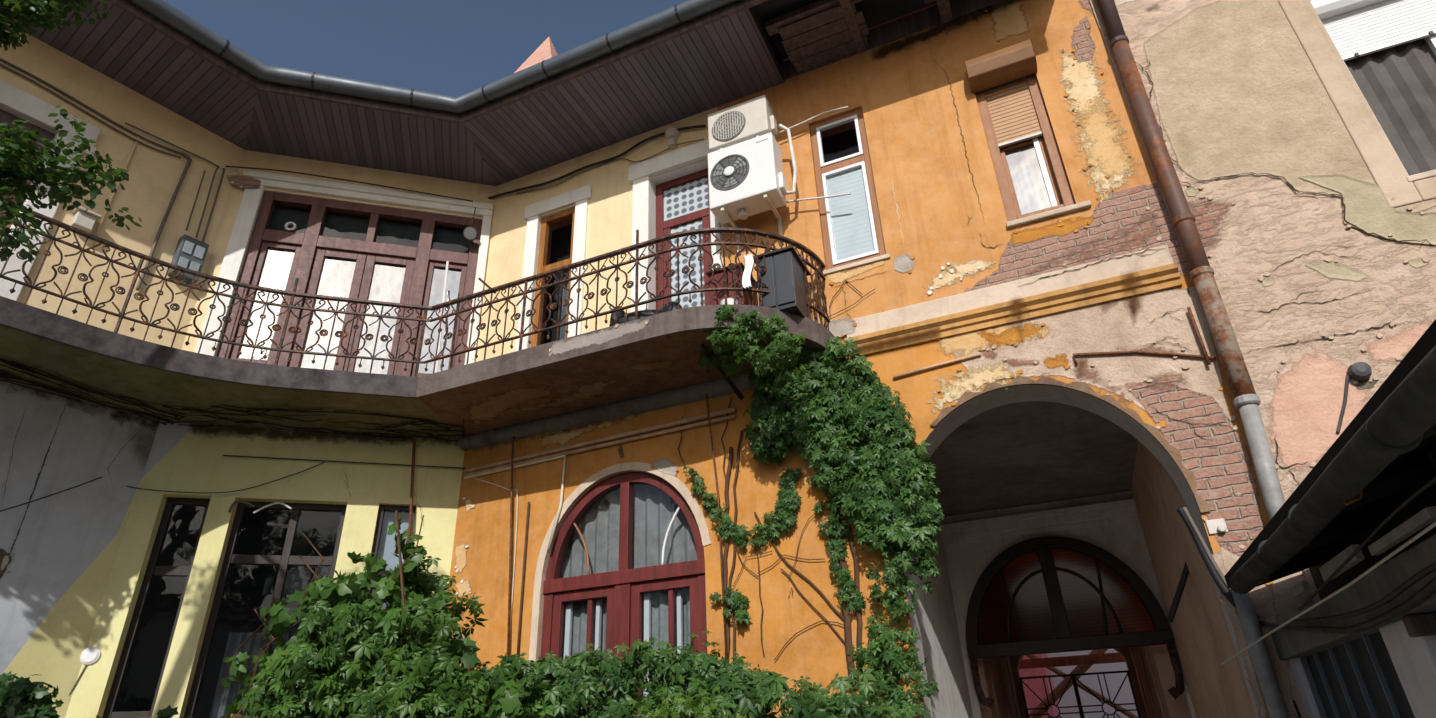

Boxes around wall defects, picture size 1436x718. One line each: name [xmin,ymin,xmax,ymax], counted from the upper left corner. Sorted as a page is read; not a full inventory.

crack [1136,61,1436,353]
spalling [927,0,1315,718]
spalling [1268,321,1433,470]
spalling [0,548,15,578]